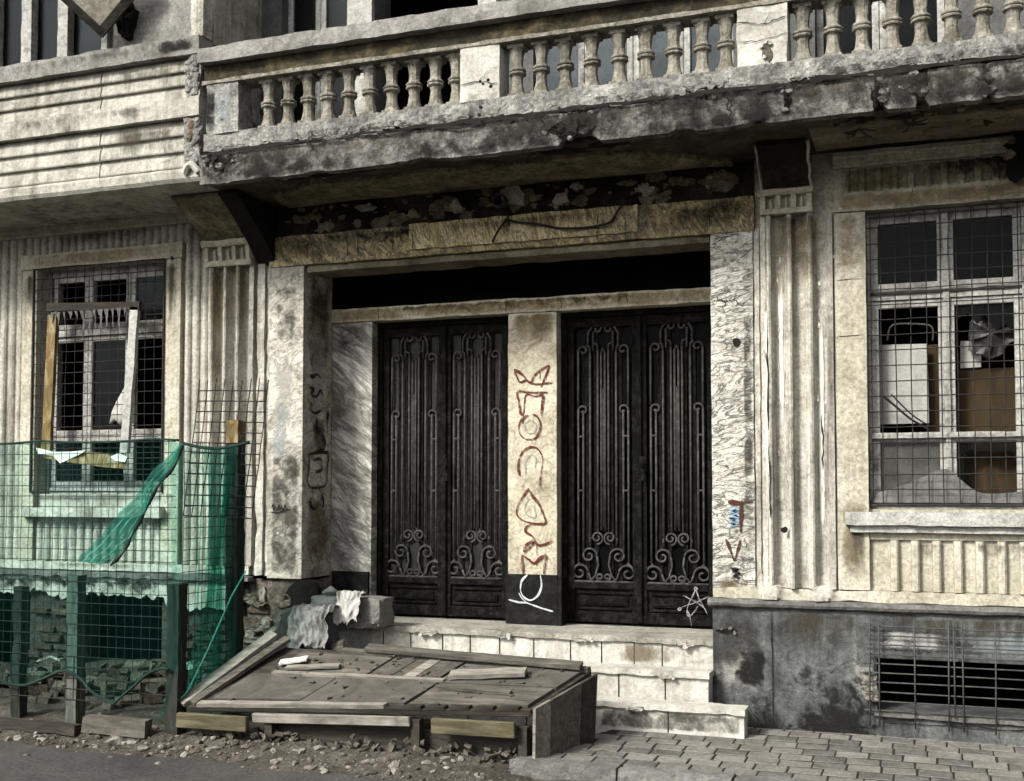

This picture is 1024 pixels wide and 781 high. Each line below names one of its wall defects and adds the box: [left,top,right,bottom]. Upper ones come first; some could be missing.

spalling [770,57,960,140]
spalling [203,122,428,169]
flaking render [276,169,740,233]
damp [724,621,878,735]